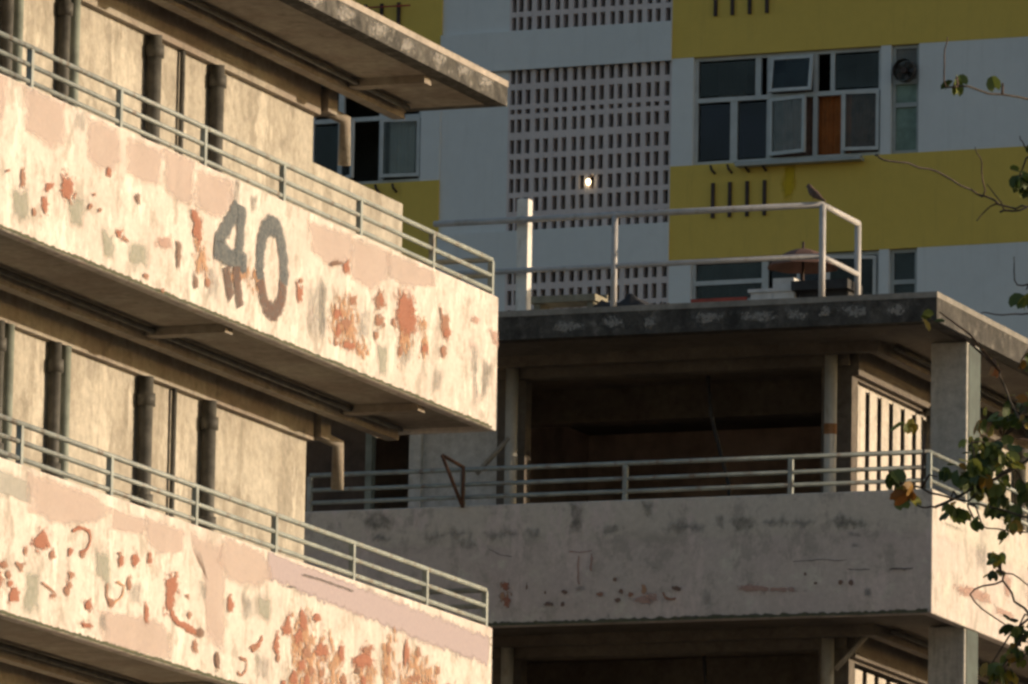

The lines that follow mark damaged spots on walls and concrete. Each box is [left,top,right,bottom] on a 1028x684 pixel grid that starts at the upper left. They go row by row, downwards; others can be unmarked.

spalling [329,283,453,369]
spalling [0,526,56,604]
spalling [42,571,77,599]
spalling [69,526,92,559]
spalling [81,598,94,630]
spalling [106,549,153,608]
spalling [162,570,205,655]
spalling [597,577,681,603]
spalling [238,608,441,684]